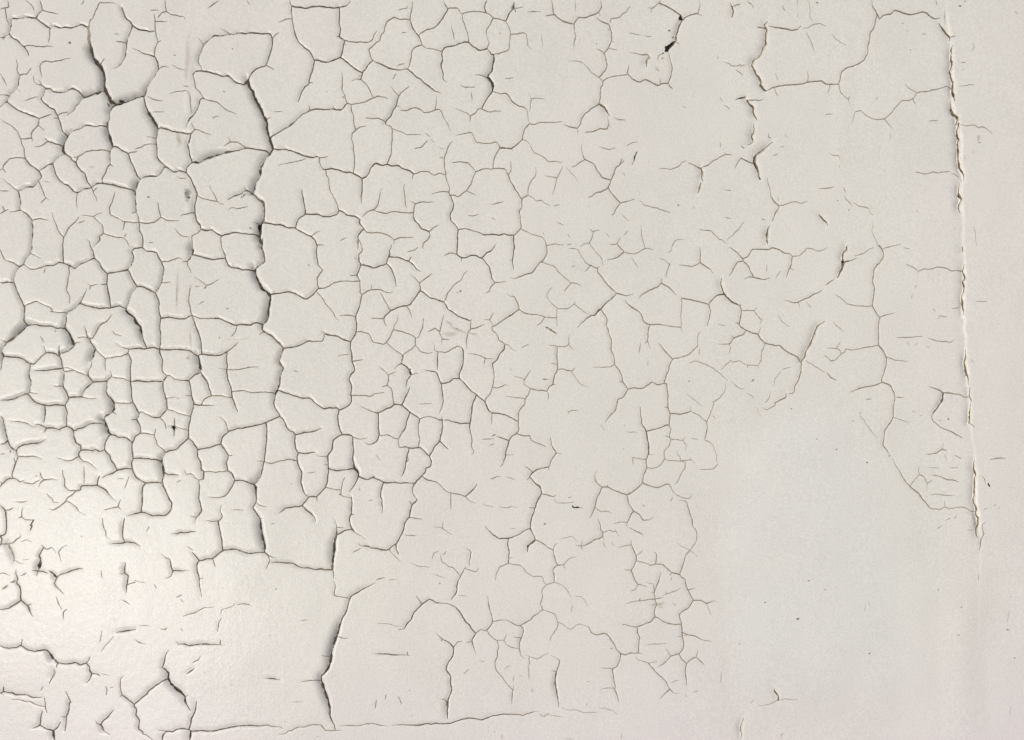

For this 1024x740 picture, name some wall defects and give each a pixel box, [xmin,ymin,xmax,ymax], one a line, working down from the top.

crack [115,5,185,77]
crack [766,1,974,115]
crack [364,184,438,252]
crack [548,145,668,215]
crack [700,179,826,280]
crack [786,187,990,550]
crack [0,418,56,486]
crack [0,501,82,617]
crack [102,519,140,546]
crack [0,641,109,740]
crack [120,650,298,740]
crack [392,634,560,726]